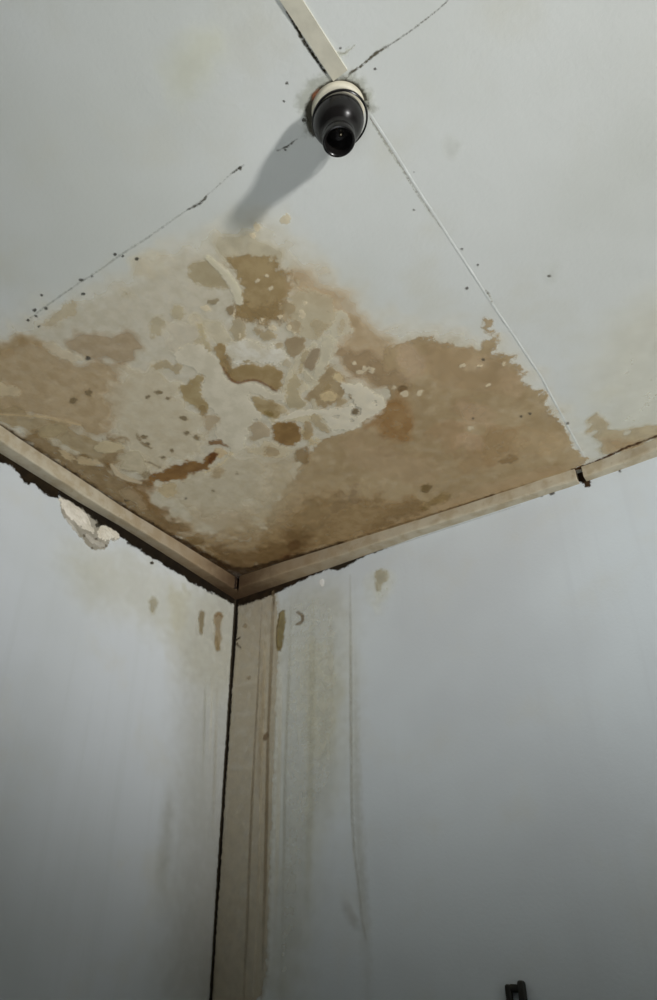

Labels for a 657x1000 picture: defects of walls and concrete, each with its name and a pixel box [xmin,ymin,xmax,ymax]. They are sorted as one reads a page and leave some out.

crack [350,2,447,74]
peeling [58,256,387,515]
damp [0,239,589,577]
crack [571,435,657,487]
damp [588,416,657,454]
spalling [59,497,120,550]
damp [212,595,278,1000]